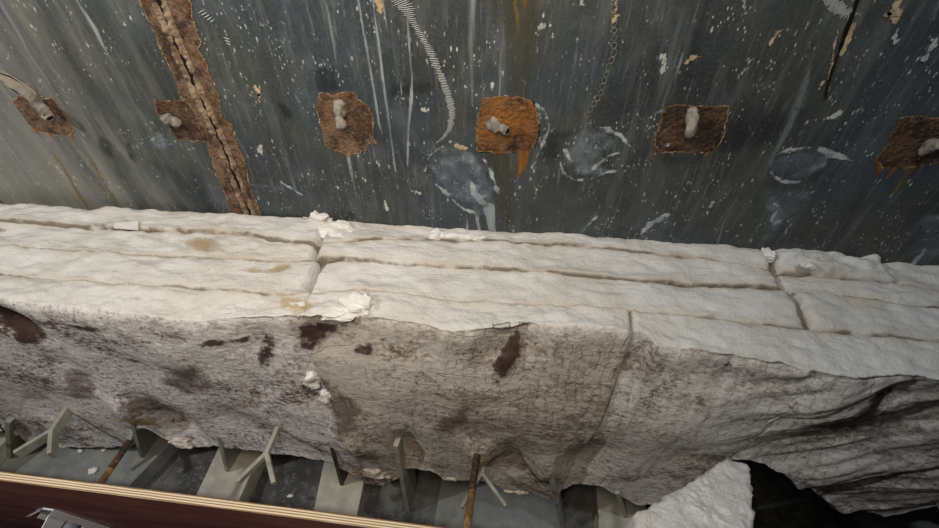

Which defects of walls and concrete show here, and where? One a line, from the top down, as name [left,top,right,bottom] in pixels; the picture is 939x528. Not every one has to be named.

peeling [0,70,37,100]
rust [12,96,74,139]
rust [138,0,261,216]
rust [316,91,376,156]
rust [476,95,539,174]
rust [654,104,729,154]
rust [876,115,939,186]
damp [0,307,48,344]
damp [492,330,521,383]